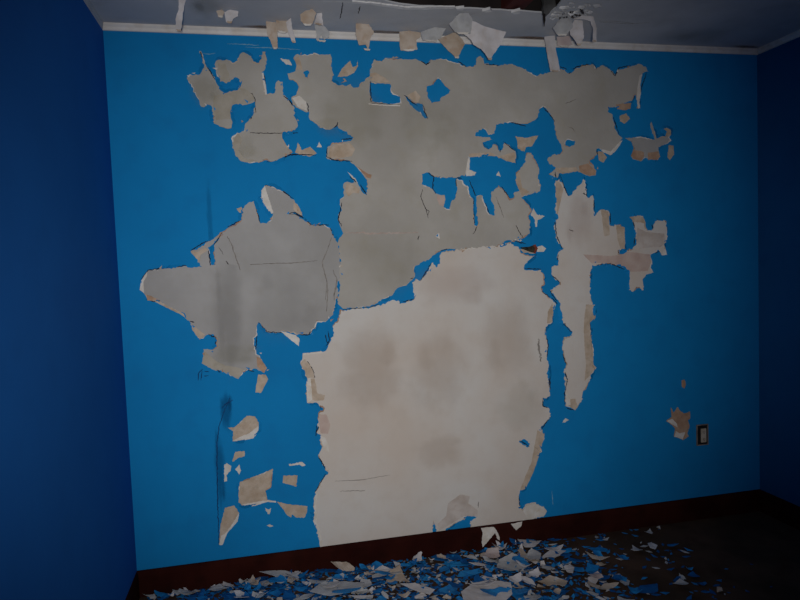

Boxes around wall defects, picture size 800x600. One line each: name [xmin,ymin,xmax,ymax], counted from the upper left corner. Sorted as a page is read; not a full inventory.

peeling [140,0,674,559]
peeling [667,407,690,440]